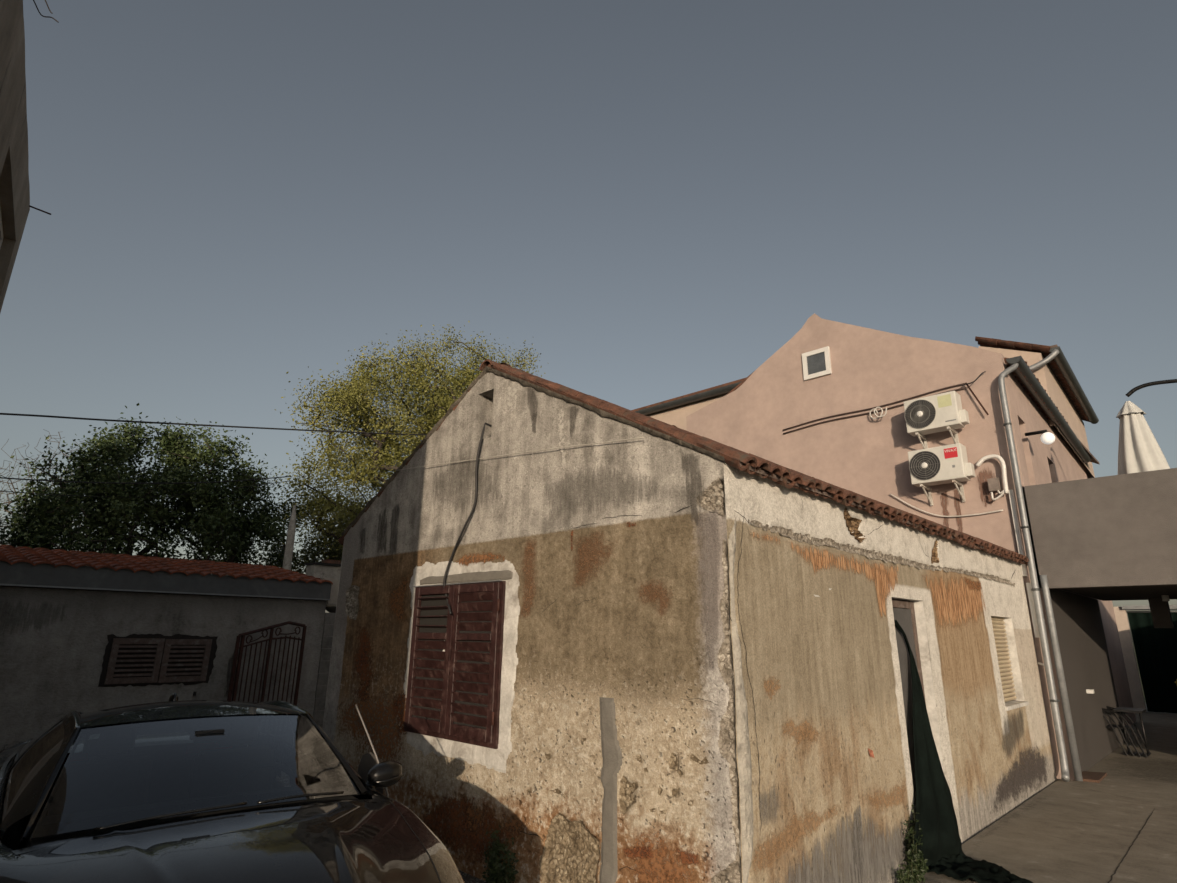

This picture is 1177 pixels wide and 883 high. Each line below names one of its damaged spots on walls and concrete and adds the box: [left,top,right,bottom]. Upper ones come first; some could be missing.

damp [506,386,537,432]
damp [360,505,399,554]
damp [680,450,702,524]
spalling [696,478,725,517]
rust [753,532,898,617]
rust [925,575,986,627]
rust [337,687,406,762]
spalling [711,540,742,883]
spalling [649,752,709,814]
damp [994,713,1047,809]
spalling [540,813,600,883]
rust [624,832,699,883]